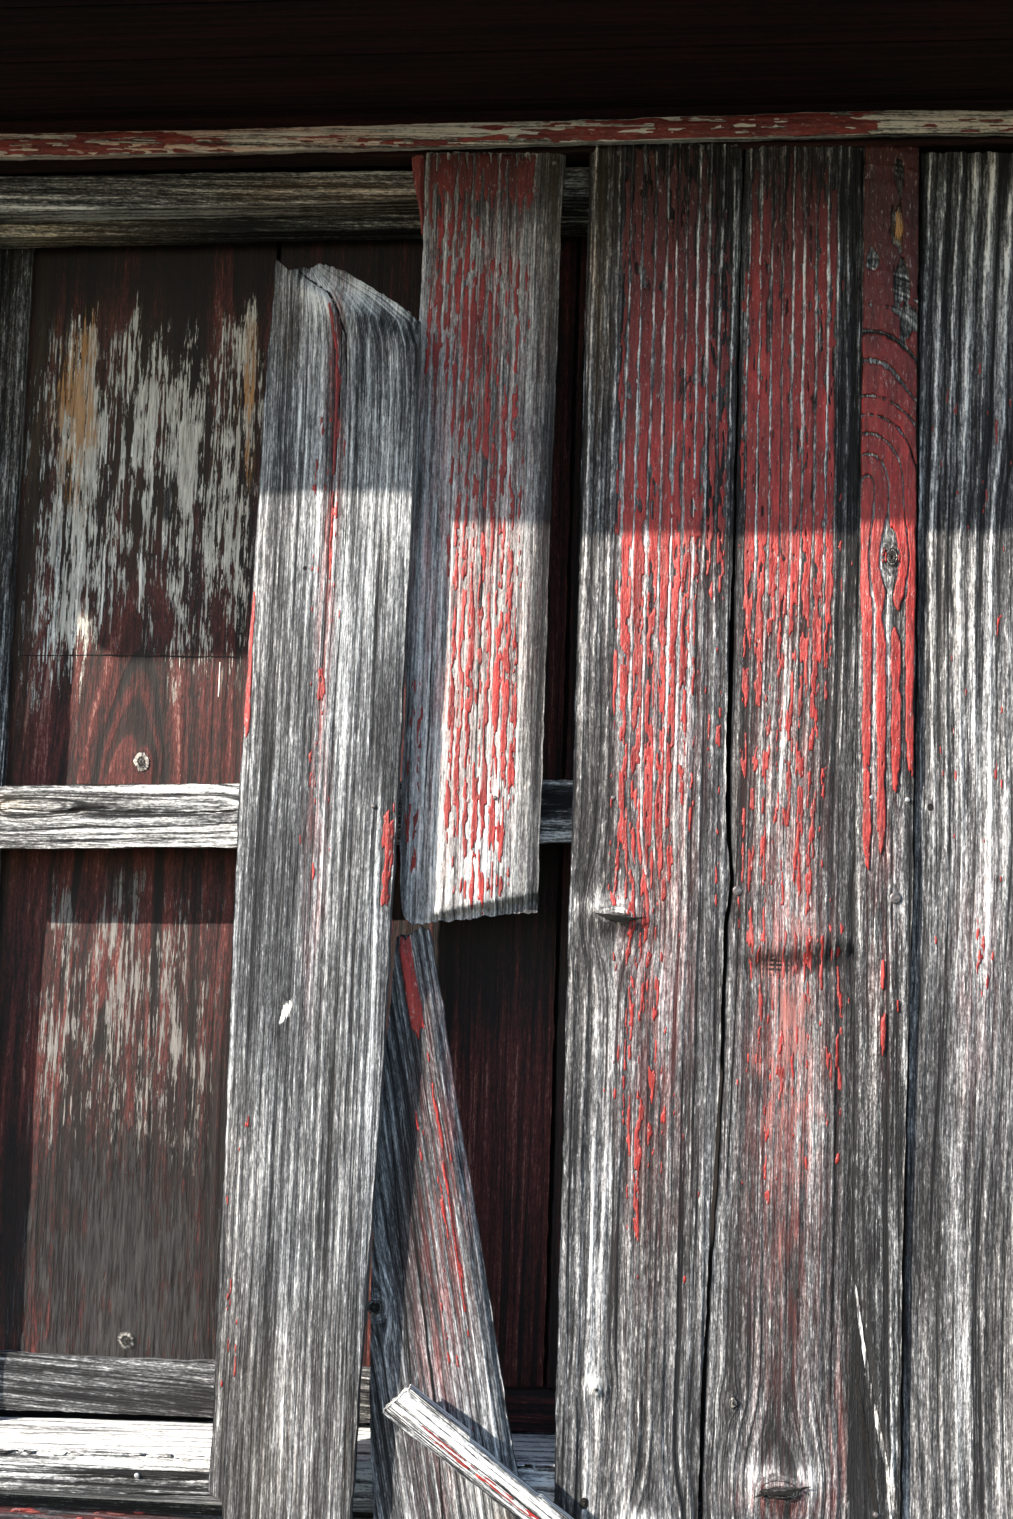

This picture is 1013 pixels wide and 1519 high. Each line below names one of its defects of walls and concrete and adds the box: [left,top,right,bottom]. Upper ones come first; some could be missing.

peeling [0,131,234,156]
peeling [958,119,1013,132]
peeling [21,293,264,737]
peeling [287,112,934,1242]
peeling [26,868,222,1164]
crack [726,905,739,1189]
peeling [976,918,994,997]
peeling [415,1083,466,1312]
peeling [221,1279,238,1387]